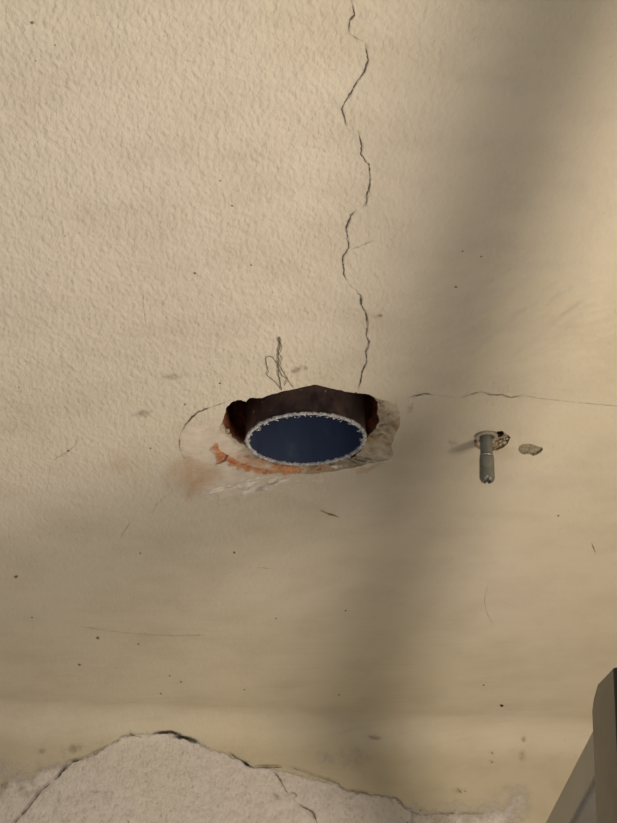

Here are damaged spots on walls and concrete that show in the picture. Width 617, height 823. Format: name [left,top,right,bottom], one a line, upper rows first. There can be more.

crack [341,0,374,390]
crack [117,731,197,744]
crack [15,752,99,823]
peeling [0,728,526,823]
crack [232,755,411,821]